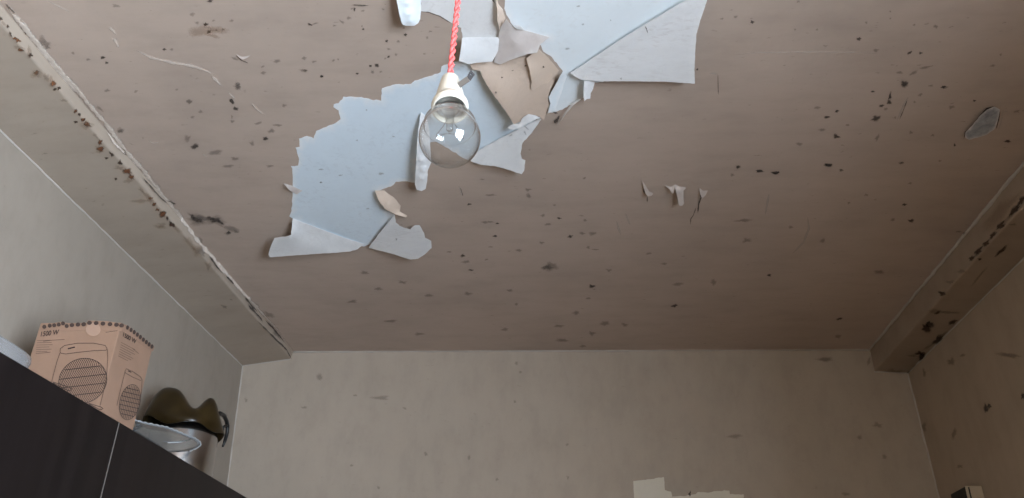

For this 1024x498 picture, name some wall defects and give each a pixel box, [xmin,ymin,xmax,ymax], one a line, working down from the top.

peeling [269,0,708,260]
peeling [633,477,744,498]